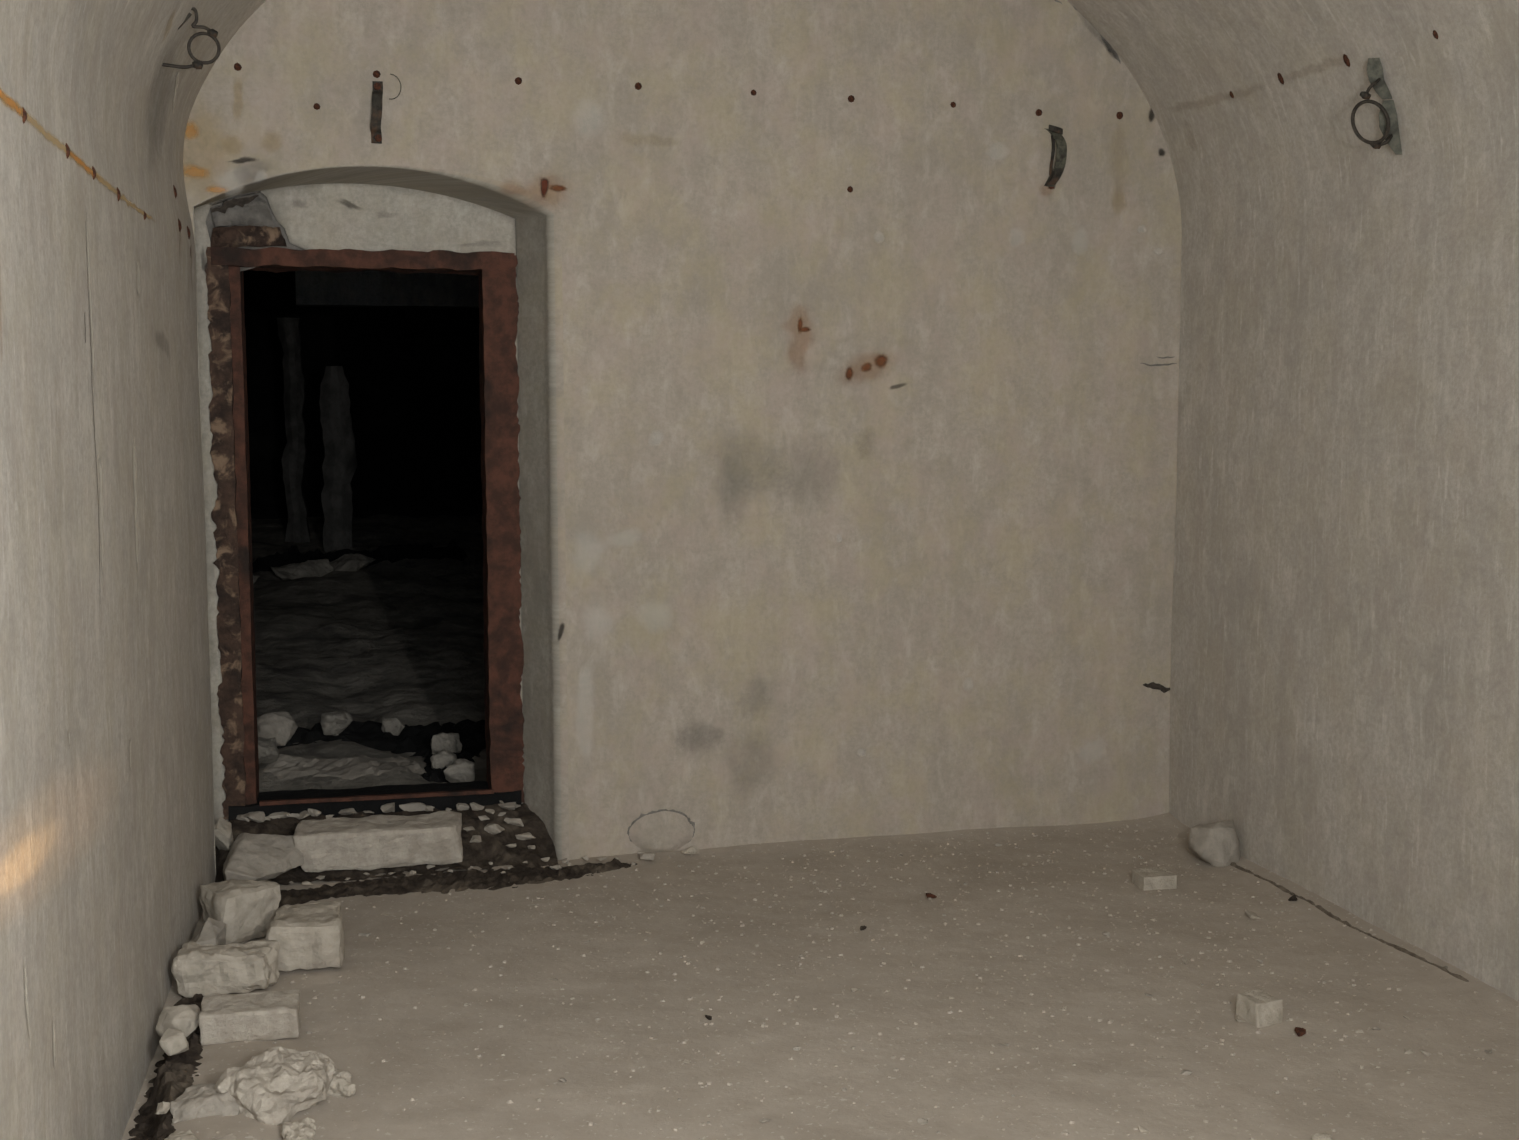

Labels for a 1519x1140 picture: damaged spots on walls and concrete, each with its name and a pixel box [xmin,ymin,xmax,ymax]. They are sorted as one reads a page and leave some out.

rust [0,90,151,218]
rust [541,179,566,197]
rust [846,355,887,379]